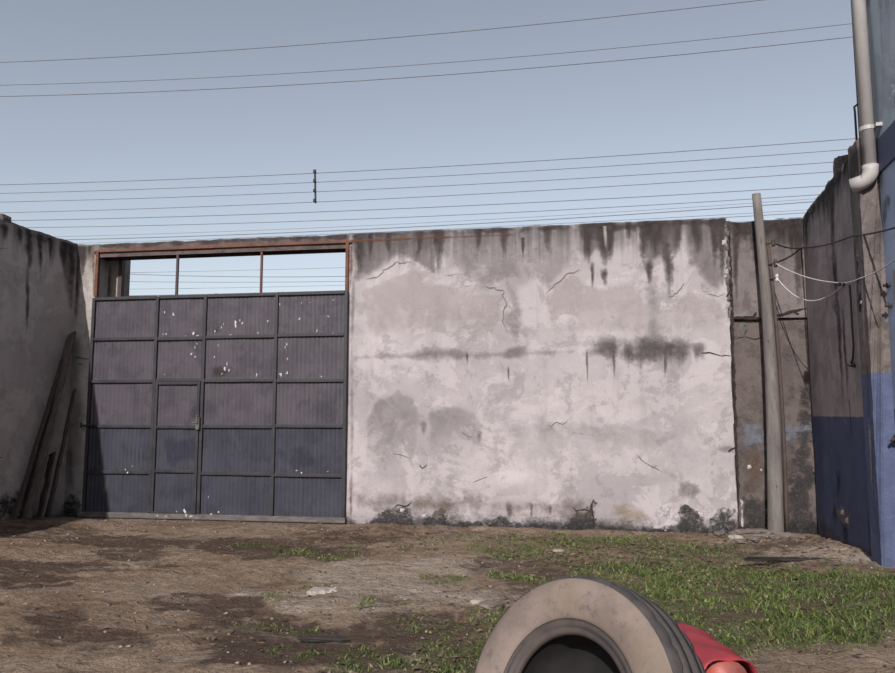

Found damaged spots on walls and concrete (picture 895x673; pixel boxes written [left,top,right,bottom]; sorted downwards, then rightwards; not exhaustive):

leakage [263,232,397,261]
leakage [409,229,444,260]
leakage [475,228,512,249]
leakage [521,225,562,252]
leakage [19,228,90,297]
leakage [601,340,703,369]
leakage [837,318,847,371]
leakage [367,497,767,533]